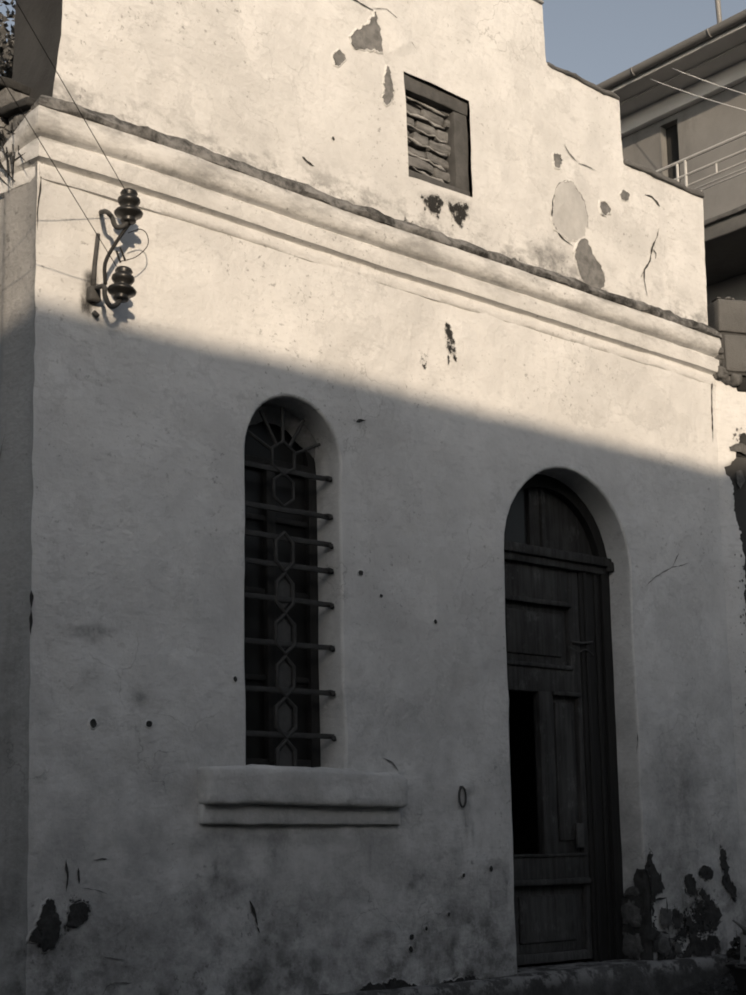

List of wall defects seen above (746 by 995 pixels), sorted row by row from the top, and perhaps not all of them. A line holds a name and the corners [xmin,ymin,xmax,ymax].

peeling [331,10,395,107]
peeling [551,152,612,289]
crack [641,194,660,293]
spalling [729,428,746,454]
spalling [26,861,91,954]
spalling [621,845,737,961]
spalling [359,976,422,991]